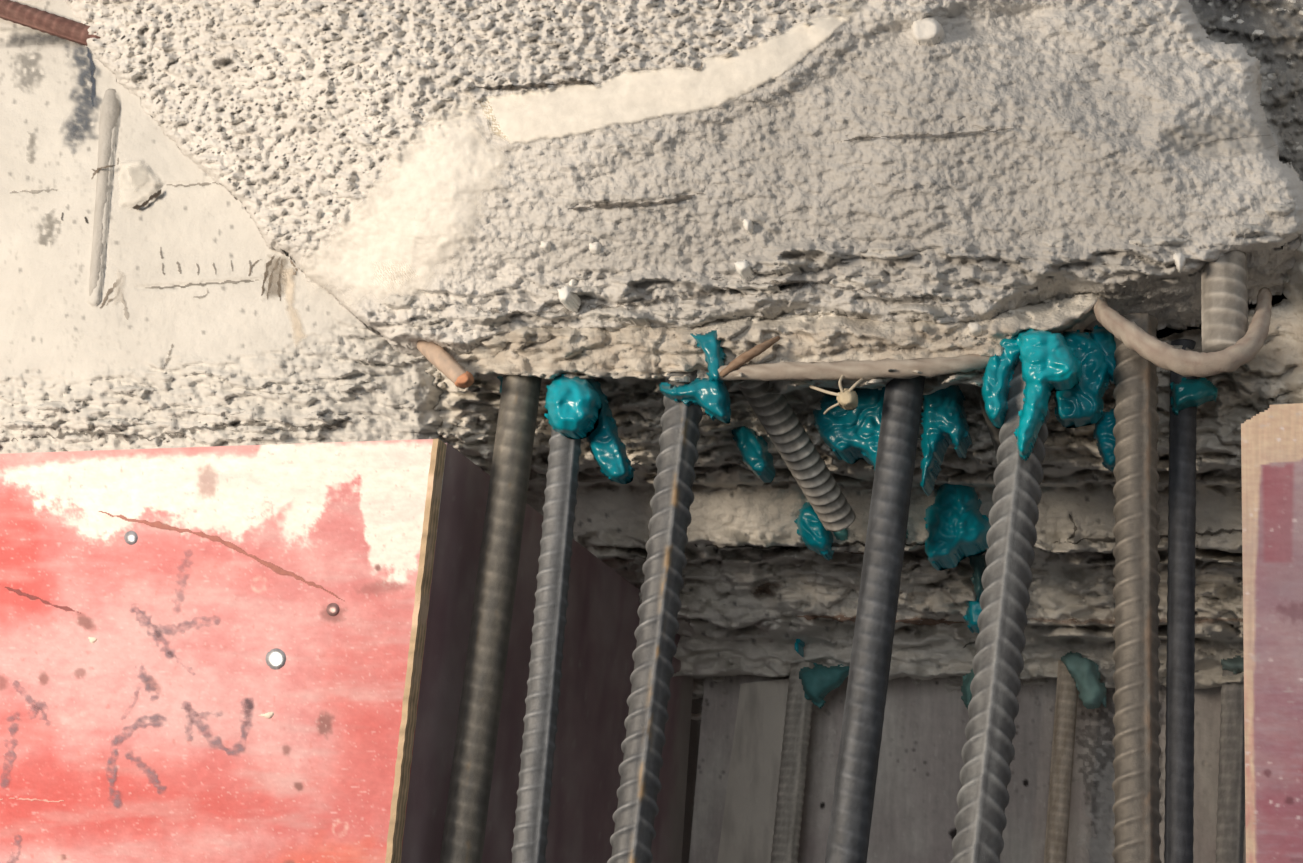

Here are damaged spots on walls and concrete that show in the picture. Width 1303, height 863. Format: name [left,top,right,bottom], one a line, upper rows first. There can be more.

corrosion [0,0,100,46]
spalling [65,0,1303,400]
spalling [3,401,378,442]
spalling [439,375,582,863]
spalling [607,370,703,863]
spalling [718,354,1052,863]
spalling [1044,660,1078,863]
spalling [1083,320,1197,863]
spalling [1215,669,1245,863]